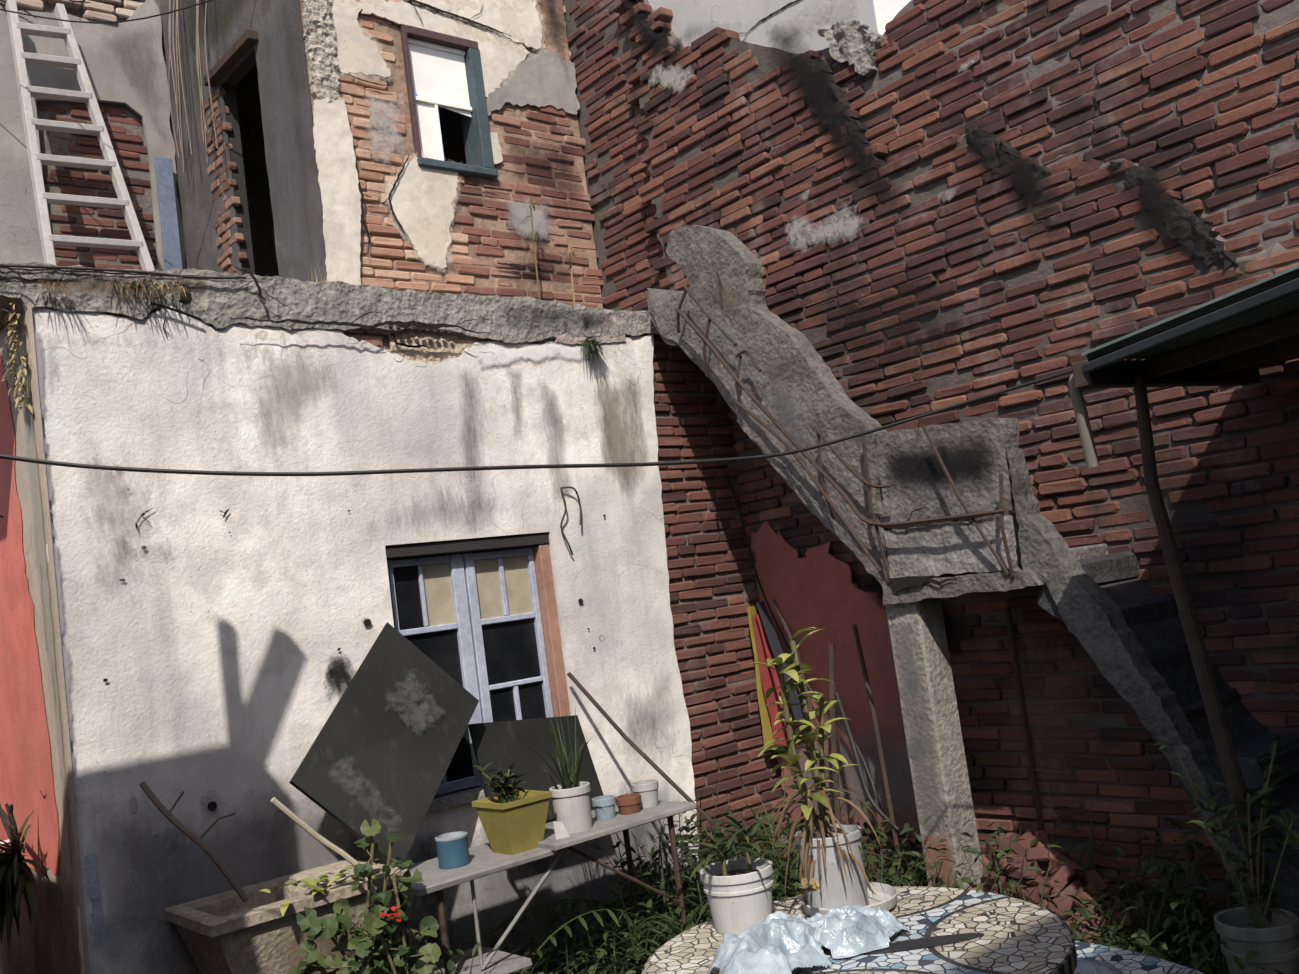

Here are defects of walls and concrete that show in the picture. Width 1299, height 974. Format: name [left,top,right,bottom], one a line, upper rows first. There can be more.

crack [740,0,800,41]
damp [598,385,637,483]
damp [889,441,989,480]
damp [326,657,353,696]